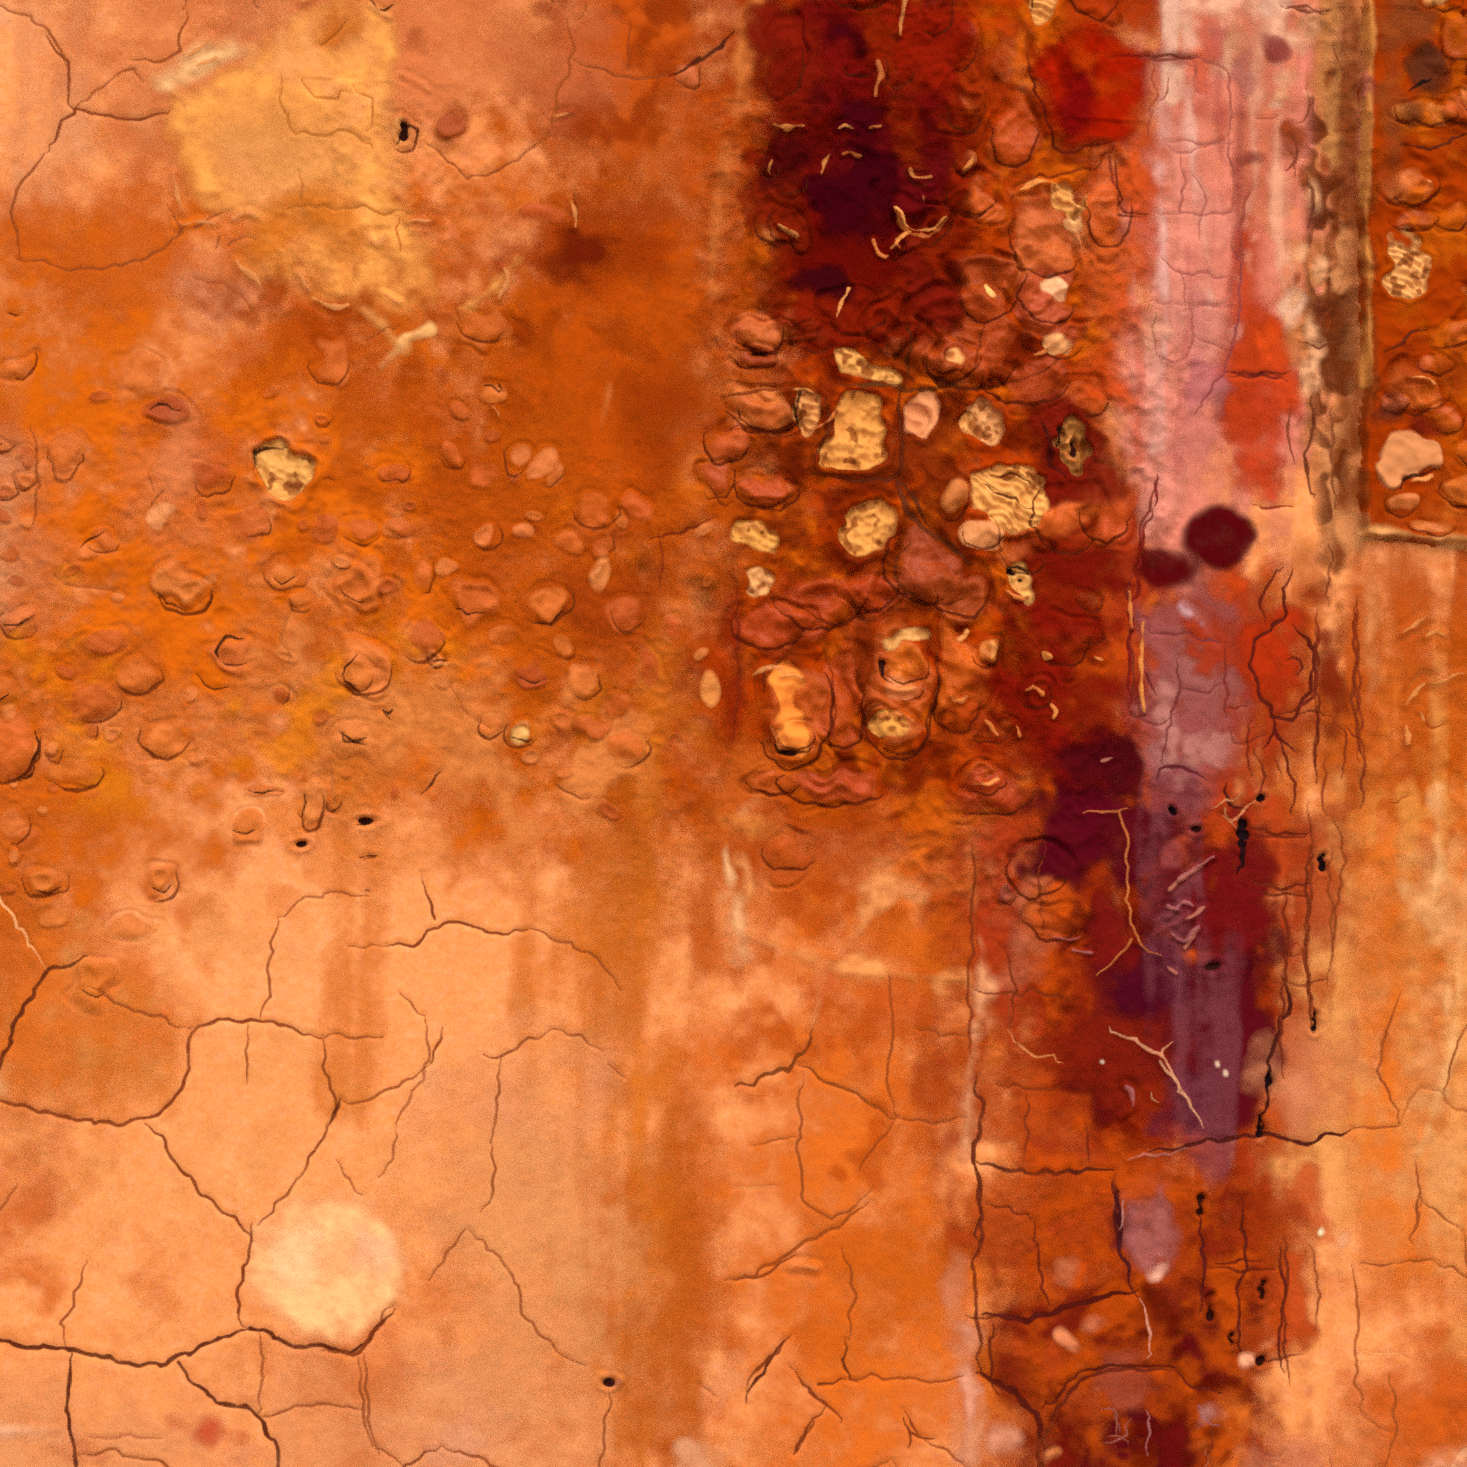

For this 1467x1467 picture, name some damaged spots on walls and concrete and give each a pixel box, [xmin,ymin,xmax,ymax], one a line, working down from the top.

leakage [123,0,540,148]
rust [520,0,776,351]
spalling [793,348,901,470]
spalling [904,389,939,438]
spalling [971,465,1048,533]
rust [1062,404,1467,1290]
crack [1126,474,1467,1152]
leakage [0,1384,89,1467]
crack [0,656,495,1467]
leakage [277,1036,708,1467]
crack [732,855,1222,1467]
rust [1059,1276,1273,1467]